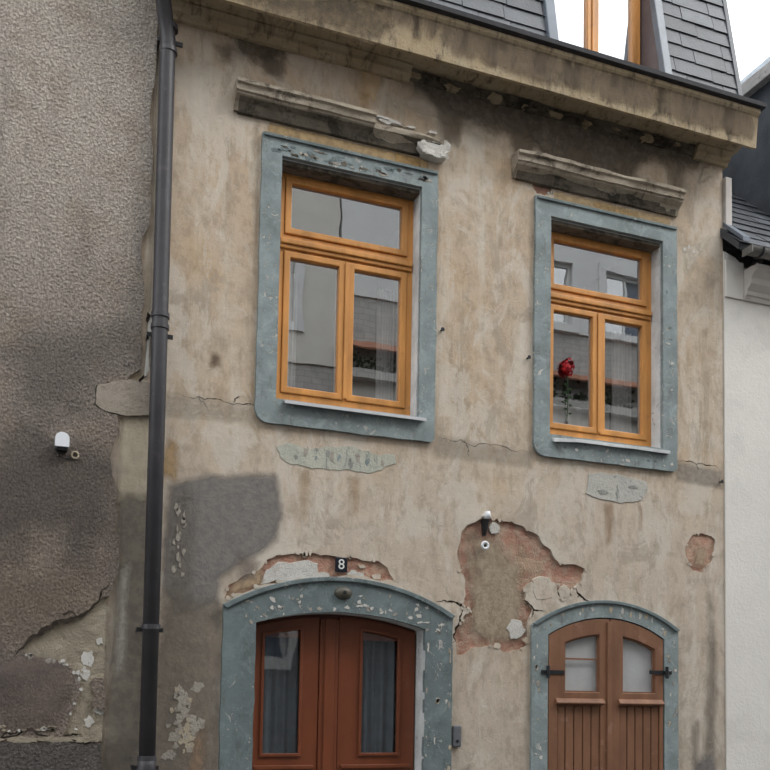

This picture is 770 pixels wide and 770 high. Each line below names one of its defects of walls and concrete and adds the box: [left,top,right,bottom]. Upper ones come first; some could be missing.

peeling [269,115,451,182]
spalling [407,69,695,157]
crack [182,395,254,410]
crack [443,438,530,456]
crack [14,583,110,656]
flaking render [224,550,393,624]
peeling [333,595,442,635]
flaking render [448,514,588,693]
flaking render [685,532,716,573]
flaking render [0,597,107,745]
crack [0,727,102,745]
peeling [161,681,205,761]